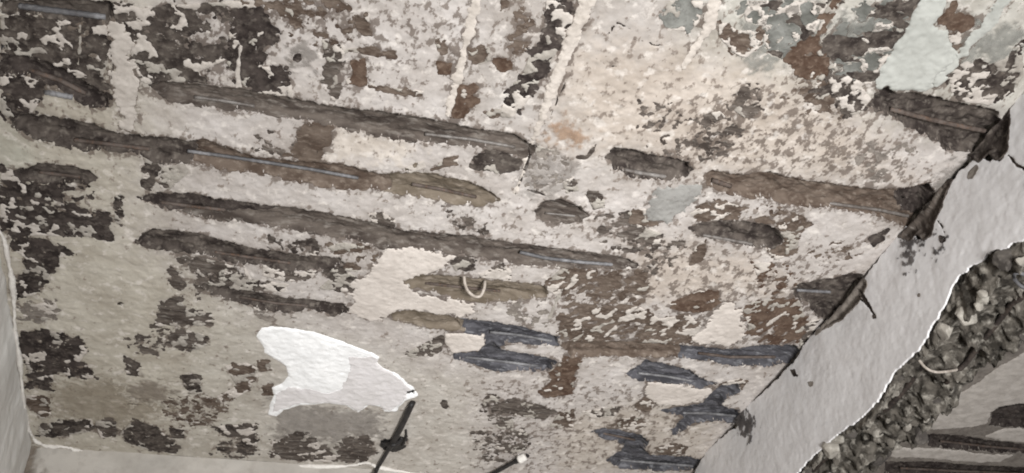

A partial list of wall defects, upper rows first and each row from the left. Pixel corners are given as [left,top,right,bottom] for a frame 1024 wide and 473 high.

spalling [717,0,1024,163]
spalling [0,0,868,435]
spalling [688,141,953,295]
spalling [470,394,700,472]
spalling [799,242,1024,473]